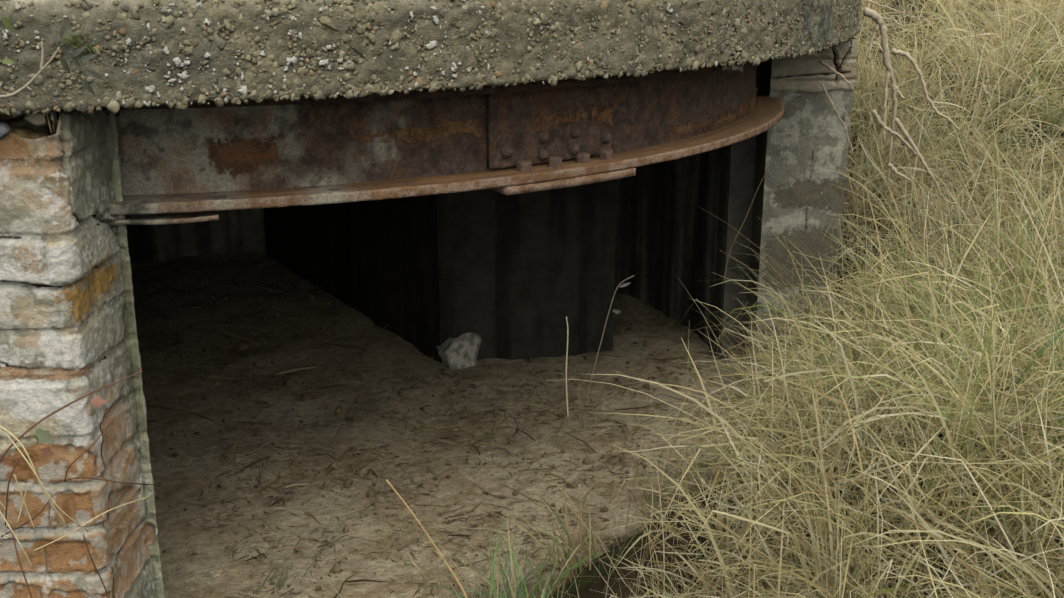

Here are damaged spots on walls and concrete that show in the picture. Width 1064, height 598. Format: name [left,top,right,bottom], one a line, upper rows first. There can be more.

corrosion [208,132,283,180]
corrosion [108,211,219,226]
spalling [0,395,156,598]